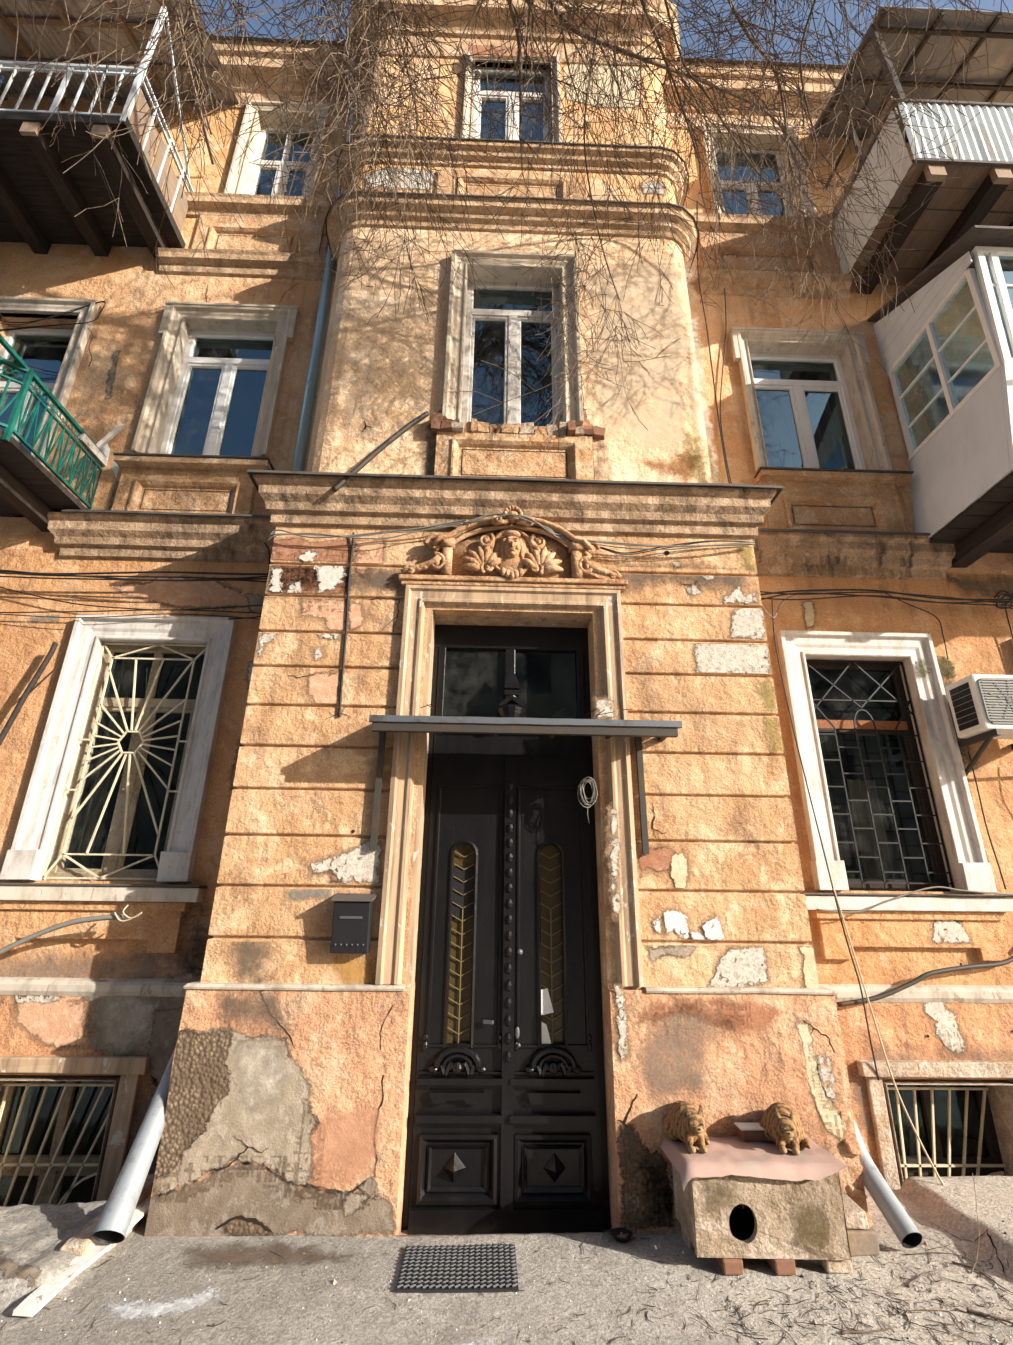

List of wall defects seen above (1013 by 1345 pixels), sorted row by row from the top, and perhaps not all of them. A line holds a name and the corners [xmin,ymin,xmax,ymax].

peeling [686,575,715,597]
peeling [113,537,387,704]
peeling [692,586,772,674]
peeling [309,839,382,884]
peeling [927,911,972,945]
peeling [708,945,770,987]
peeling [923,1002,967,1056]
flaking render [13,972,320,1196]
crack [210,1004,394,1207]
flaking render [616,1122,673,1230]
crack [216,1215,272,1232]
flaking render [224,1219,273,1237]